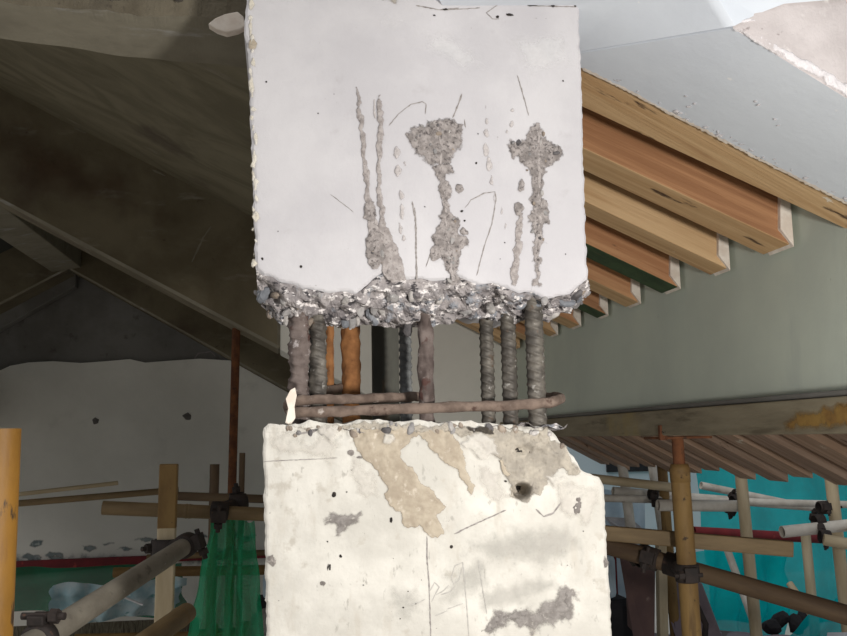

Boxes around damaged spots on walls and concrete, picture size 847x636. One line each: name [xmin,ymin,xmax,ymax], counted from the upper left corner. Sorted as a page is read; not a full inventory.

spalling [248,0,257,97]
spalling [250,107,259,242]
spalling [251,201,591,337]
spalling [286,421,581,503]
crack [424,538,432,636]